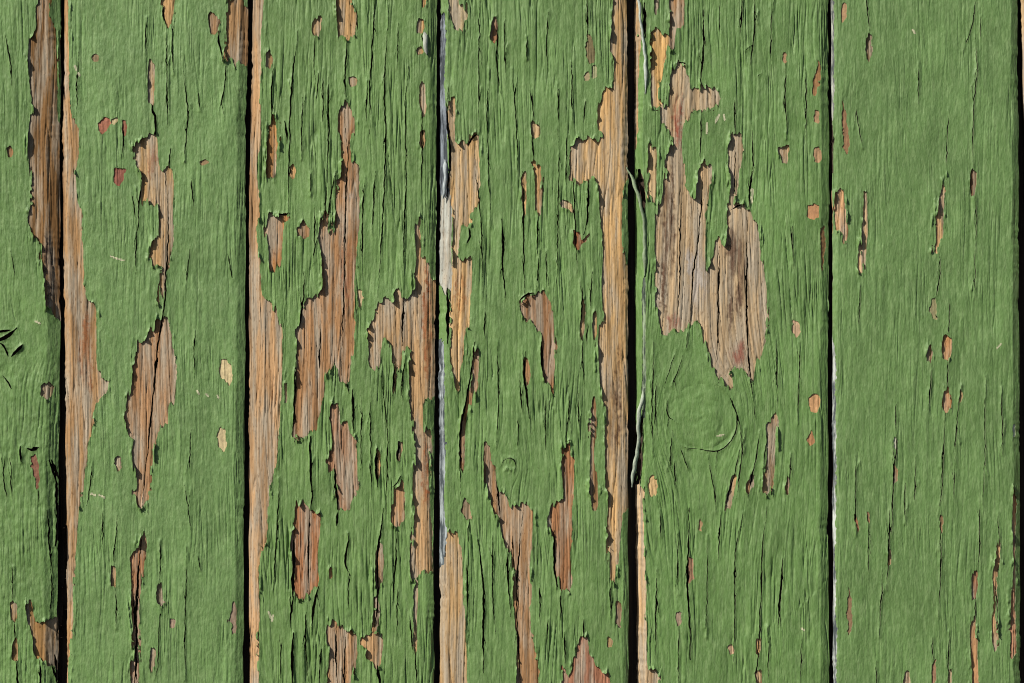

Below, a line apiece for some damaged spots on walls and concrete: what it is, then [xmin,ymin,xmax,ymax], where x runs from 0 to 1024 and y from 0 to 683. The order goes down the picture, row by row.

peeling [7,0,178,683]
peeling [208,0,484,683]
peeling [479,0,770,683]